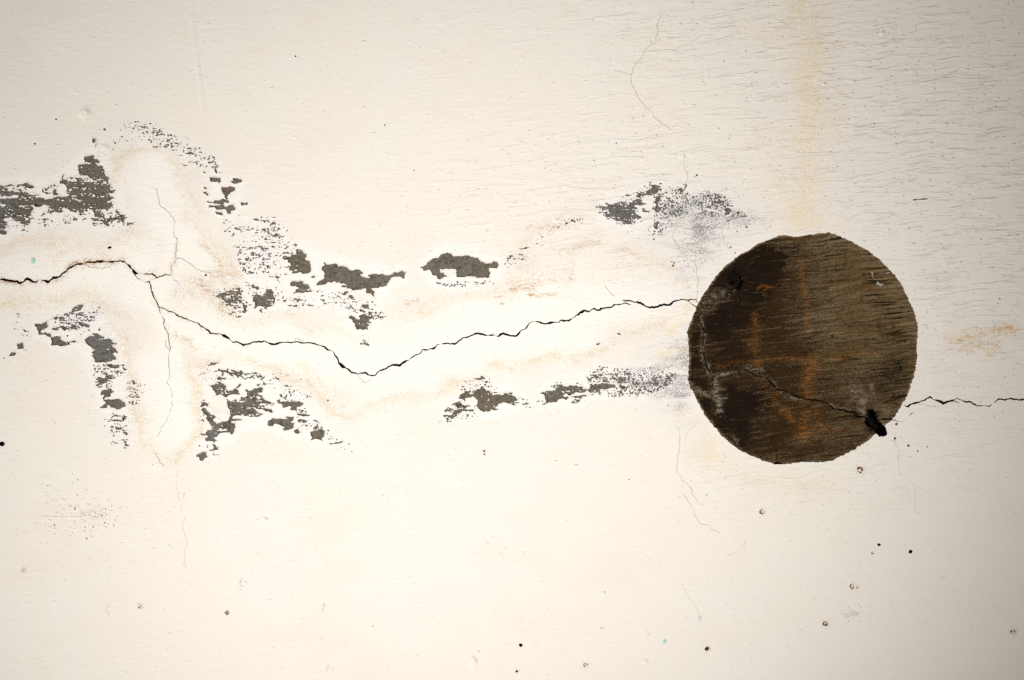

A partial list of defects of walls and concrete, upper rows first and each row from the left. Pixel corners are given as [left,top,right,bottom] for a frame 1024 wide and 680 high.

peeling [1,303,146,448]
peeling [195,360,353,463]
peeling [0,121,581,346]
leakage [0,0,916,506]
crack [0,154,1024,567]
peeling [594,181,748,240]
peeling [436,220,918,464]